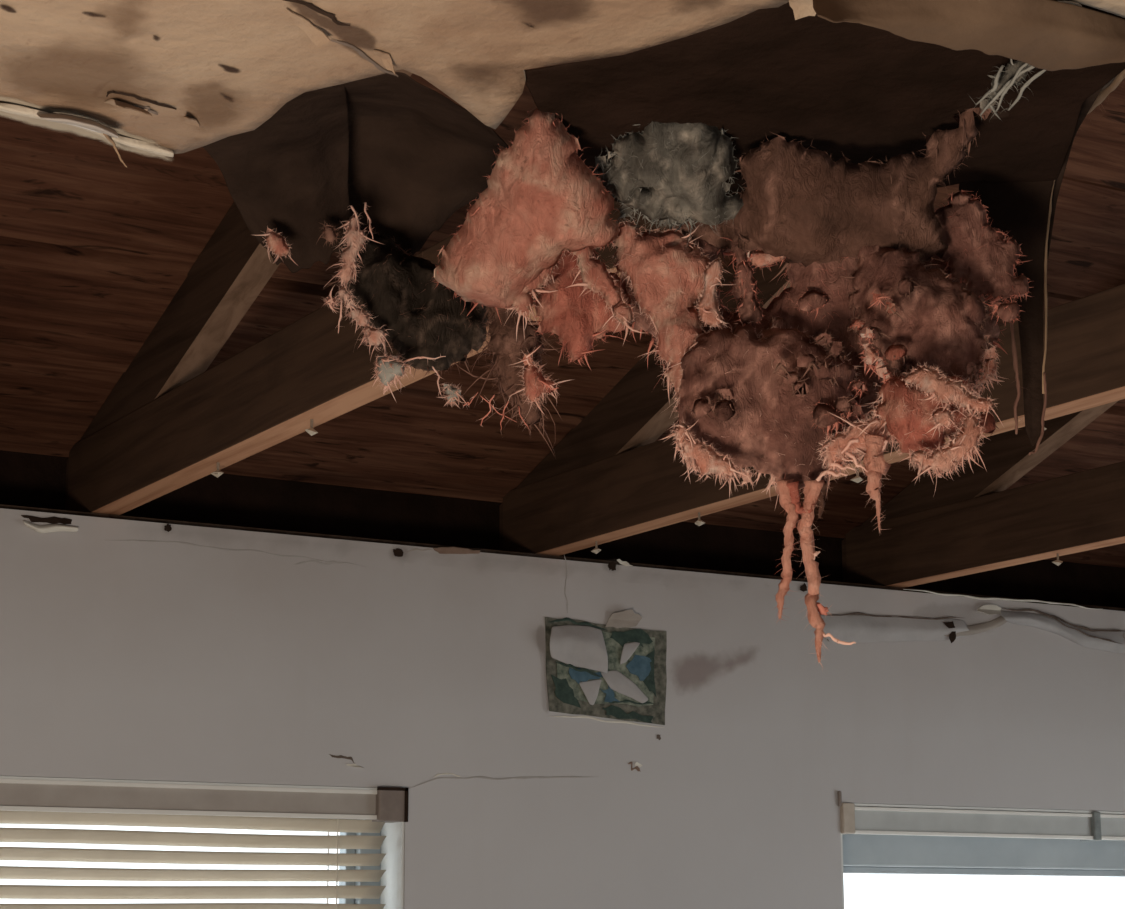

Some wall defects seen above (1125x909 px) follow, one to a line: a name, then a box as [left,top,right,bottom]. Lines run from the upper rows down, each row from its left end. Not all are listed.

damp [520,0,578,20]
peeling [286,7,330,46]
spalling [21,515,78,533]